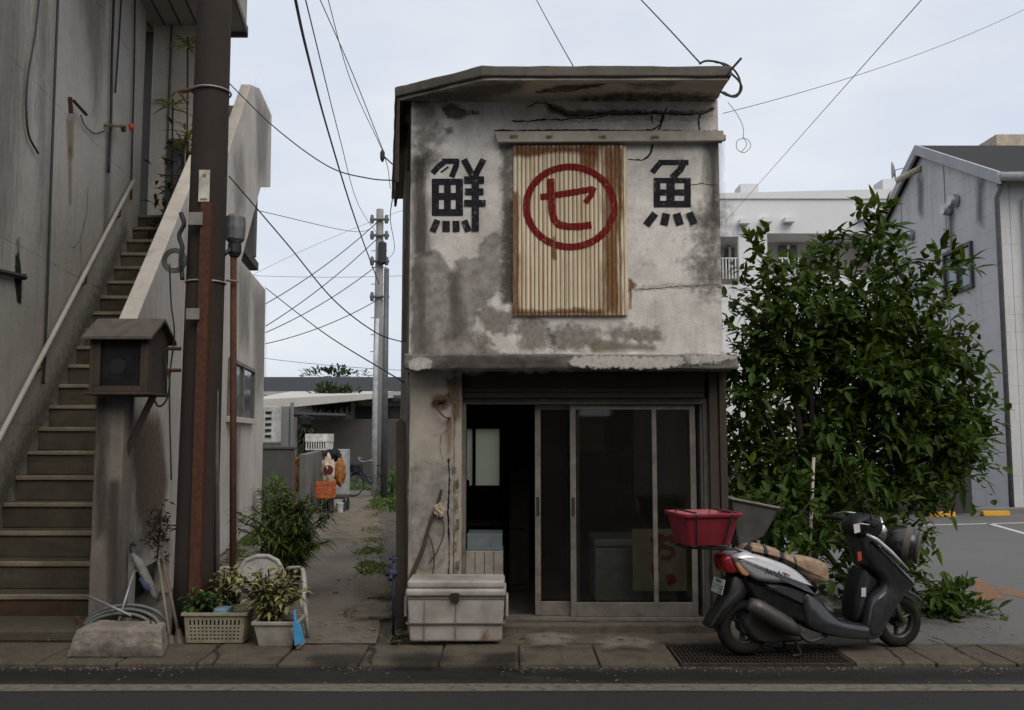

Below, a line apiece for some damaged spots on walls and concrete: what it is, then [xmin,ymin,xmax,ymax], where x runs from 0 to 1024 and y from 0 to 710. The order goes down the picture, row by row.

crack [494,102,719,161]
water stain [413,158,427,254]
water stain [500,146,513,303]
corrosion [510,135,635,316]
peeling [409,233,736,370]
crack [633,283,722,291]